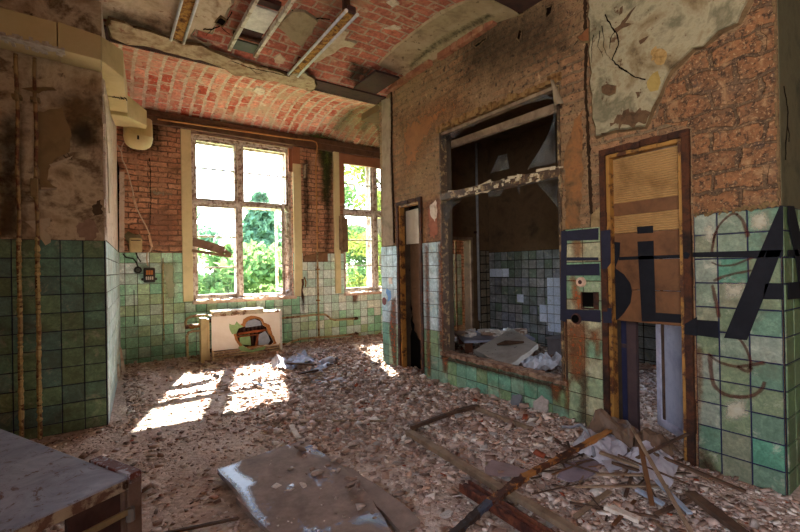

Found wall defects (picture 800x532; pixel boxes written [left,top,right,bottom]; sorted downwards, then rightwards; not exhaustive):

water stain [0,117,17,234]
water stain [64,95,99,147]
spalling [103,0,291,76]
crack [574,0,646,228]
spalling [564,0,781,229]
rust [425,244,600,423]